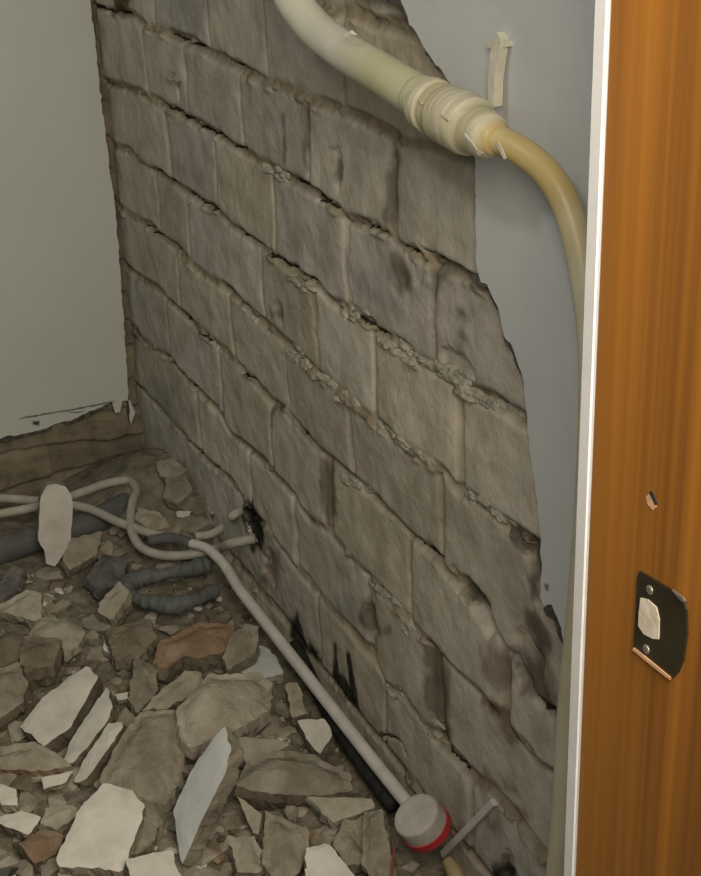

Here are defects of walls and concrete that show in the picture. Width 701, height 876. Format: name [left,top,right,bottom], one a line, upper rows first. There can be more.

flaking render [0,211,147,495]
flaking render [90,0,563,876]
flaking render [0,784,41,840]
flaking render [40,771,73,794]